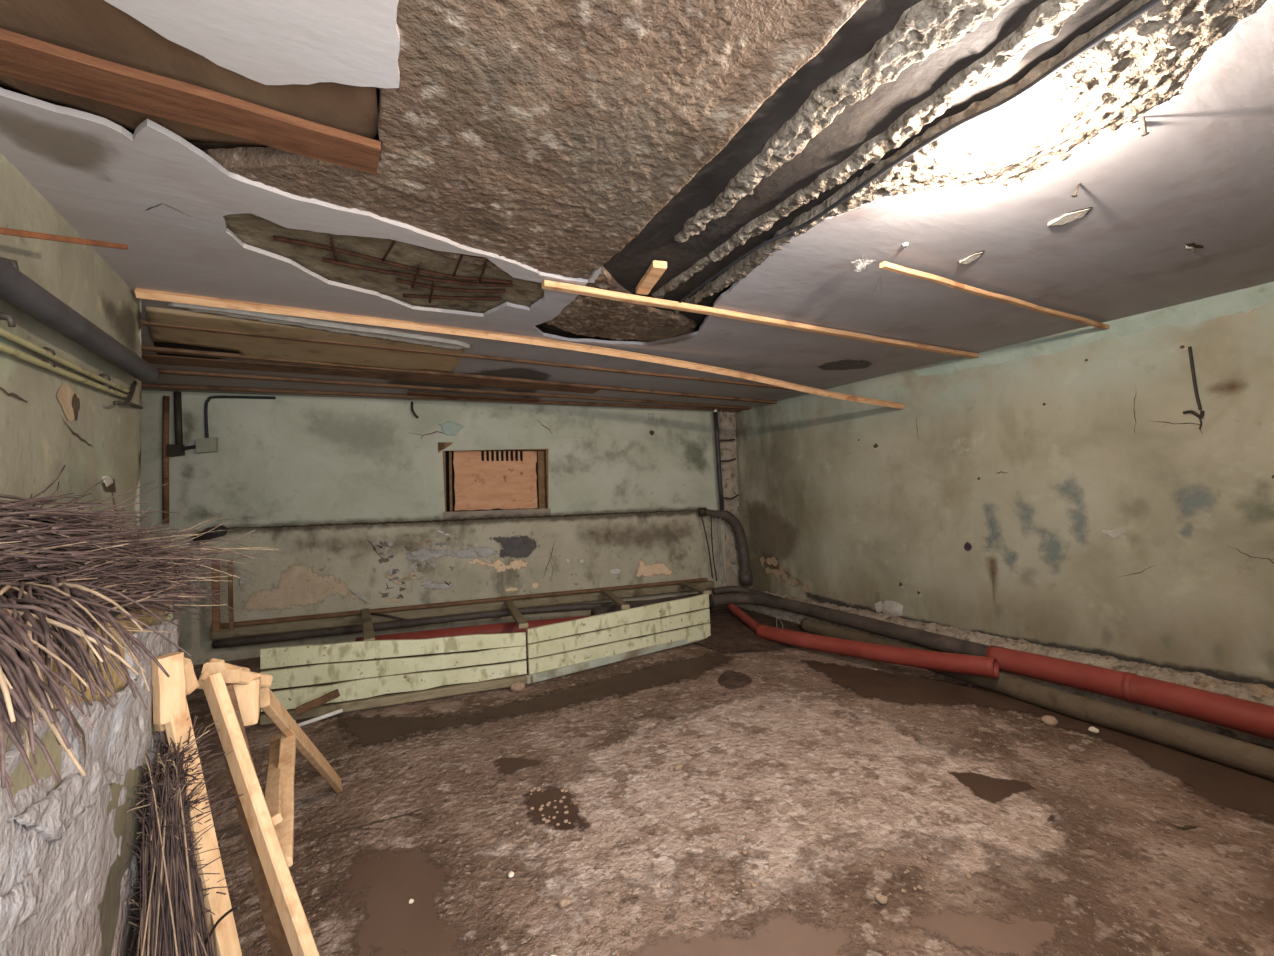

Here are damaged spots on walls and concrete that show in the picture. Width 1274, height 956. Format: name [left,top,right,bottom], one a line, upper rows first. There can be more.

peeling [1047,207,1093,226]
spalling [224,213,544,313]
peeling [959,251,985,265]
peeling [635,558,674,577]